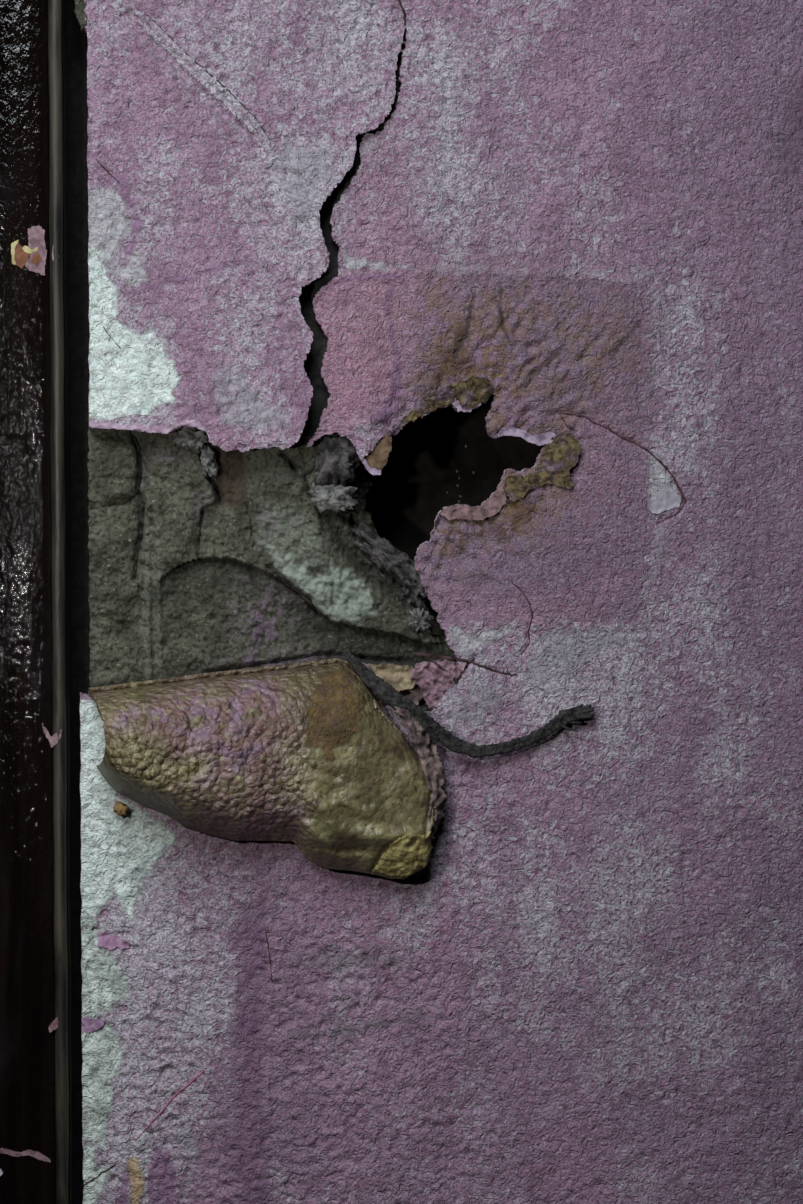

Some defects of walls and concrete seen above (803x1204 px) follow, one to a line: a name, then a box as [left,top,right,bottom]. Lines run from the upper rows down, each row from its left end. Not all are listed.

flaking render [80,176,581,1204]
crack [299,0,406,437]